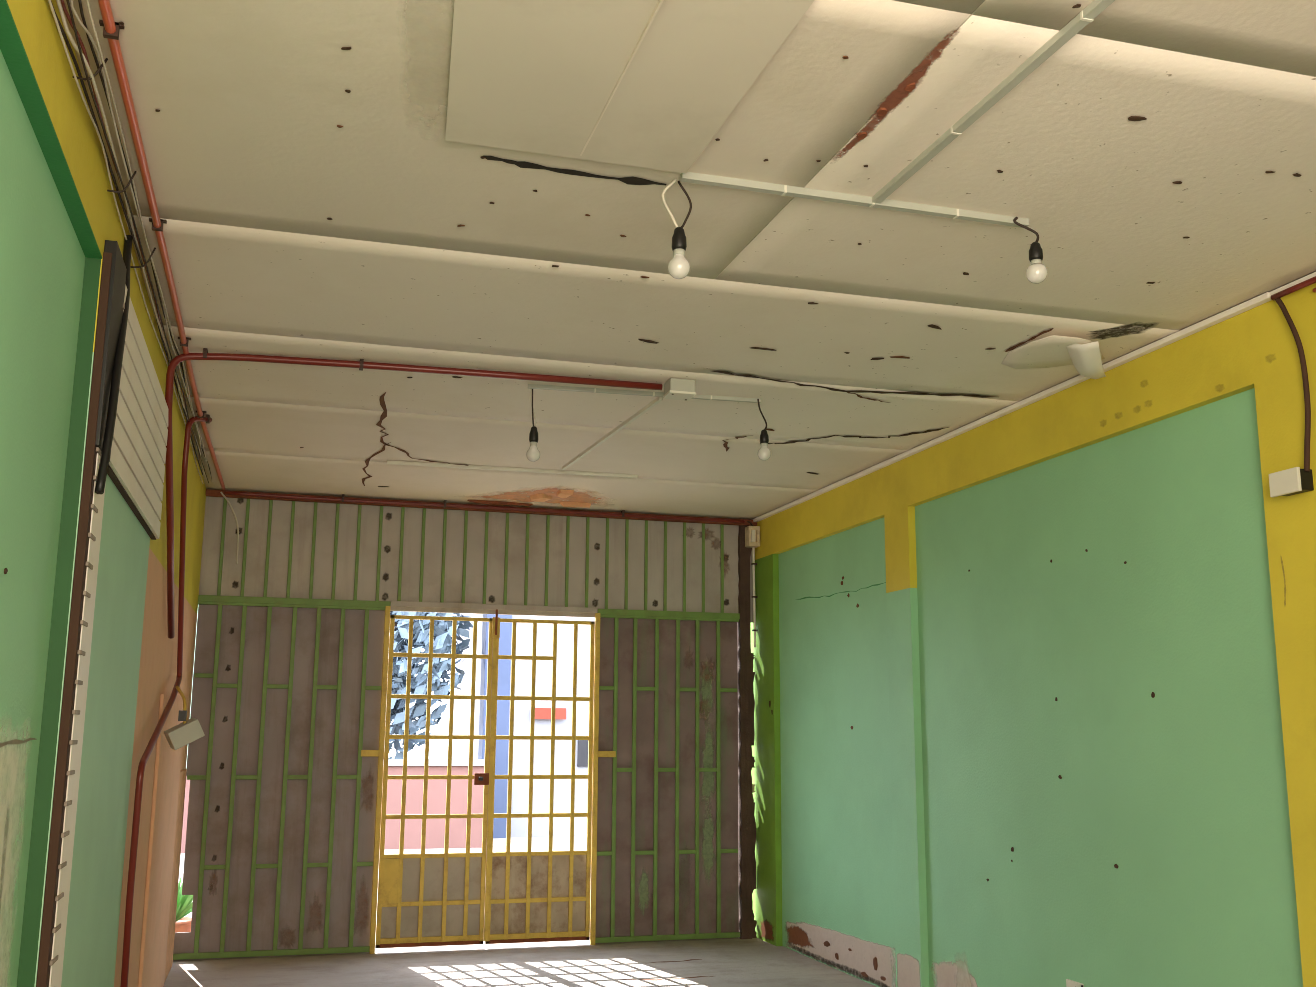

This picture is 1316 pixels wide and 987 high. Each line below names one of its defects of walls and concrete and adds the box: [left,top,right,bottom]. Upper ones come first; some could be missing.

crack [362,392,468,486]
flaking render [761,920,978,987]